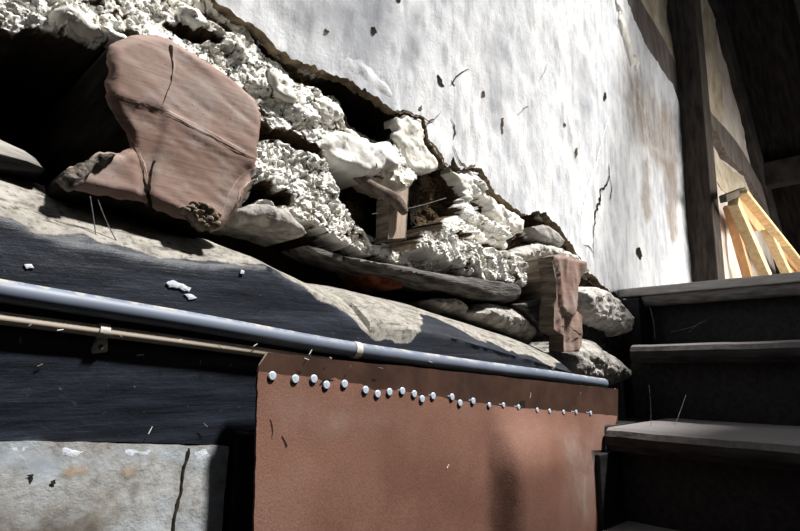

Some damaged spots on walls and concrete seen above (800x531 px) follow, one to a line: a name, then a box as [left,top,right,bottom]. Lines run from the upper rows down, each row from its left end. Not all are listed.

peeling [615,0,640,71]
spalling [0,0,553,304]
crack [585,167,612,258]
spalling [578,275,598,288]
crack [173,448,190,531]